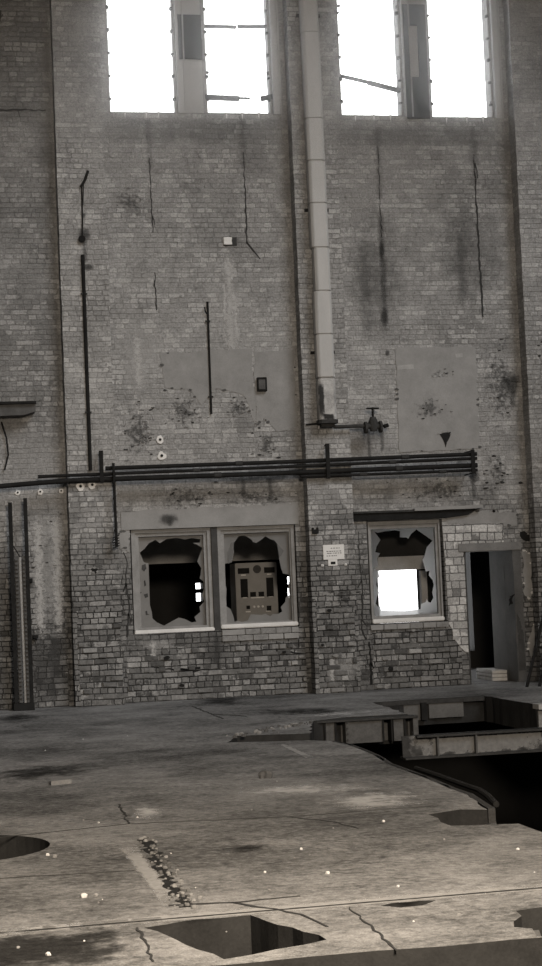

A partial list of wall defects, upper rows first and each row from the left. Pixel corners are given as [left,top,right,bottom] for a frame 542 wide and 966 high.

crack [147,158,155,232]
crack [243,152,260,259]
crack [376,146,384,237]
crack [473,154,484,317]